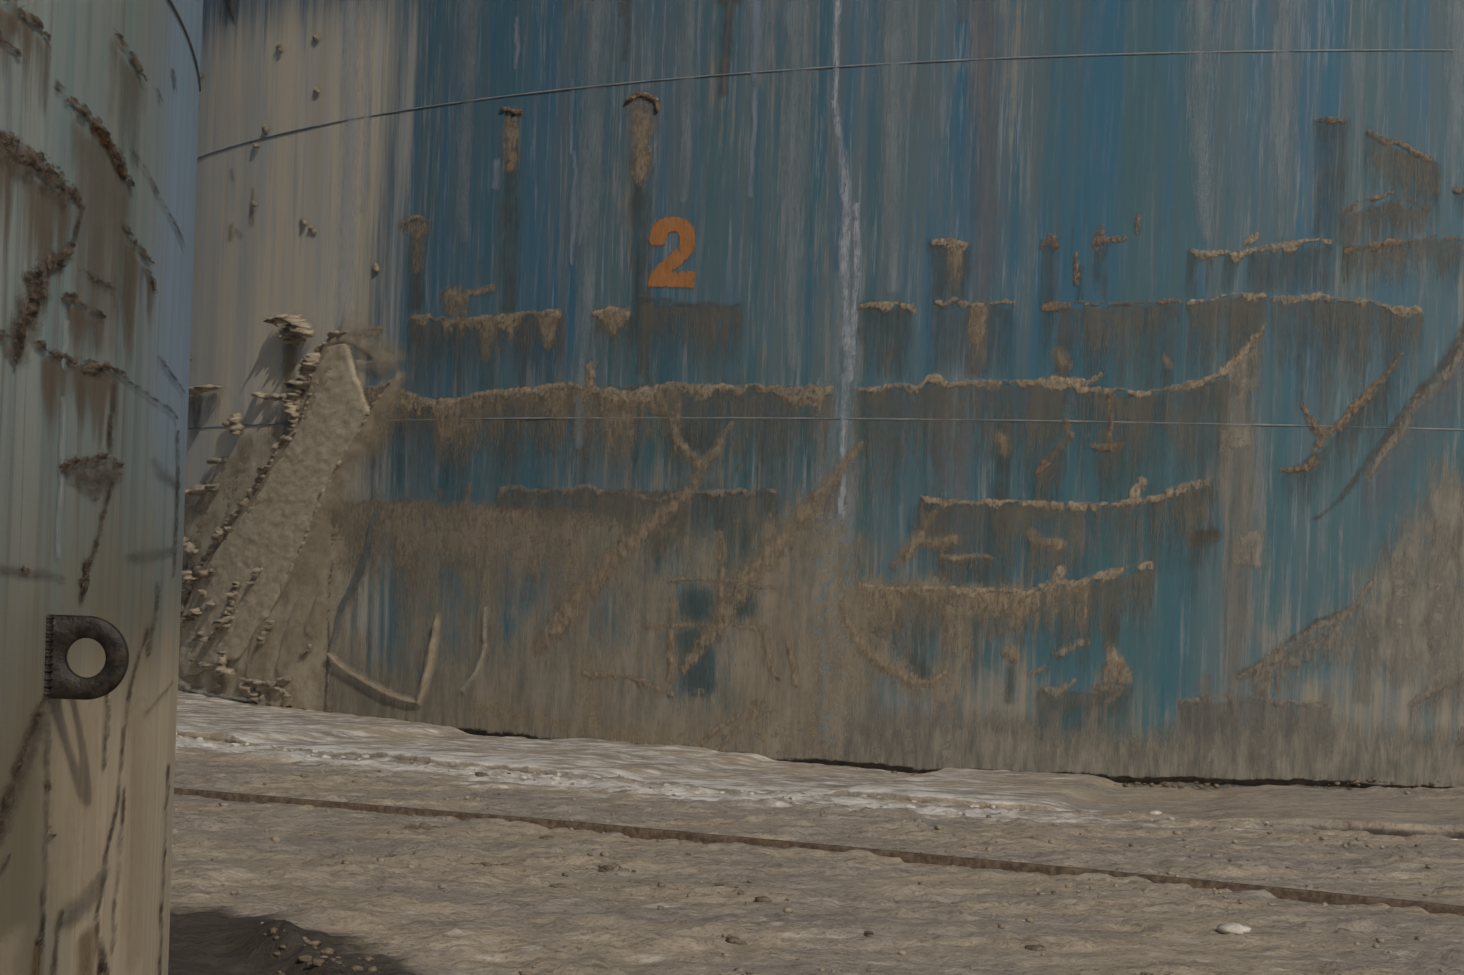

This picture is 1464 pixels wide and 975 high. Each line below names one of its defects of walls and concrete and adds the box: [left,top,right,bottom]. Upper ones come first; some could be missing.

crack [0,211,83,368]
damp [81,137,153,325]
peeling [410,285,561,358]
corrosion [500,106,523,172]
corrosion [625,91,660,184]
damp [819,0,861,404]
peeling [1041,213,1462,317]
peeling [362,360,834,651]
damp [817,410,858,542]
peeling [856,323,1266,474]
crack [1280,340,1464,479]
crack [34,361,185,975]